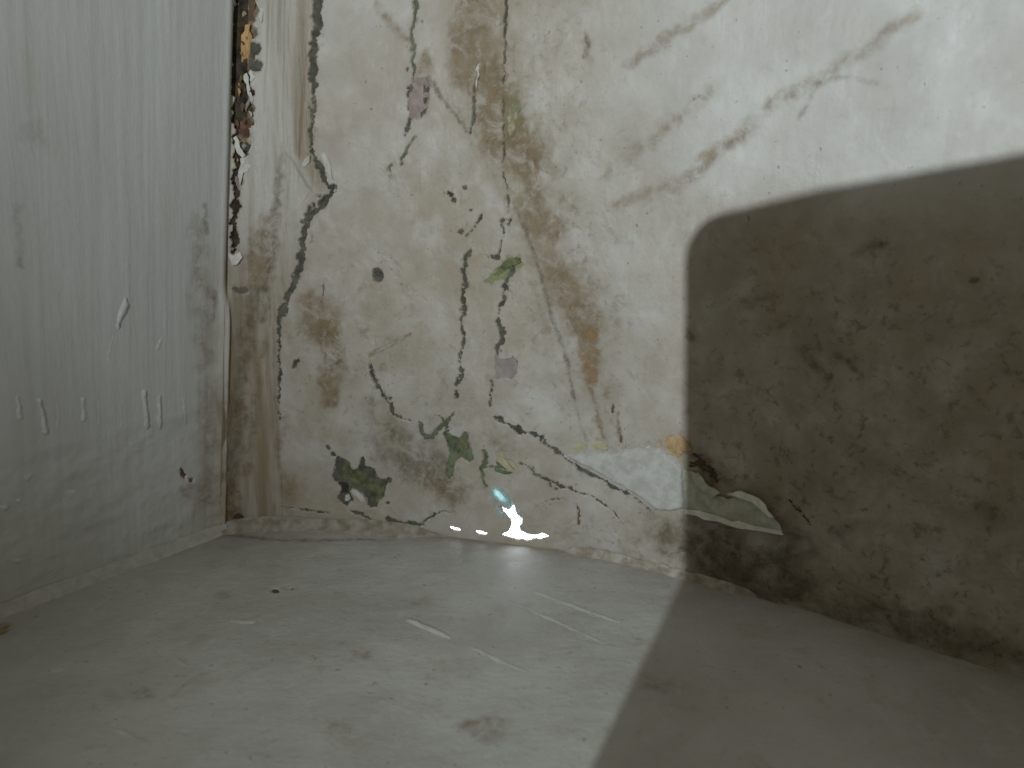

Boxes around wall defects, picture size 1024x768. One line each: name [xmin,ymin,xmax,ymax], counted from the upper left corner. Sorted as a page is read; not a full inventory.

spalling [228,0,264,266]
crack [277,0,337,420]
crack [387,0,430,176]
crack [447,0,649,525]
peeling [326,445,392,512]
crack [369,363,411,421]
peeling [418,415,474,480]
peeling [683,463,783,535]